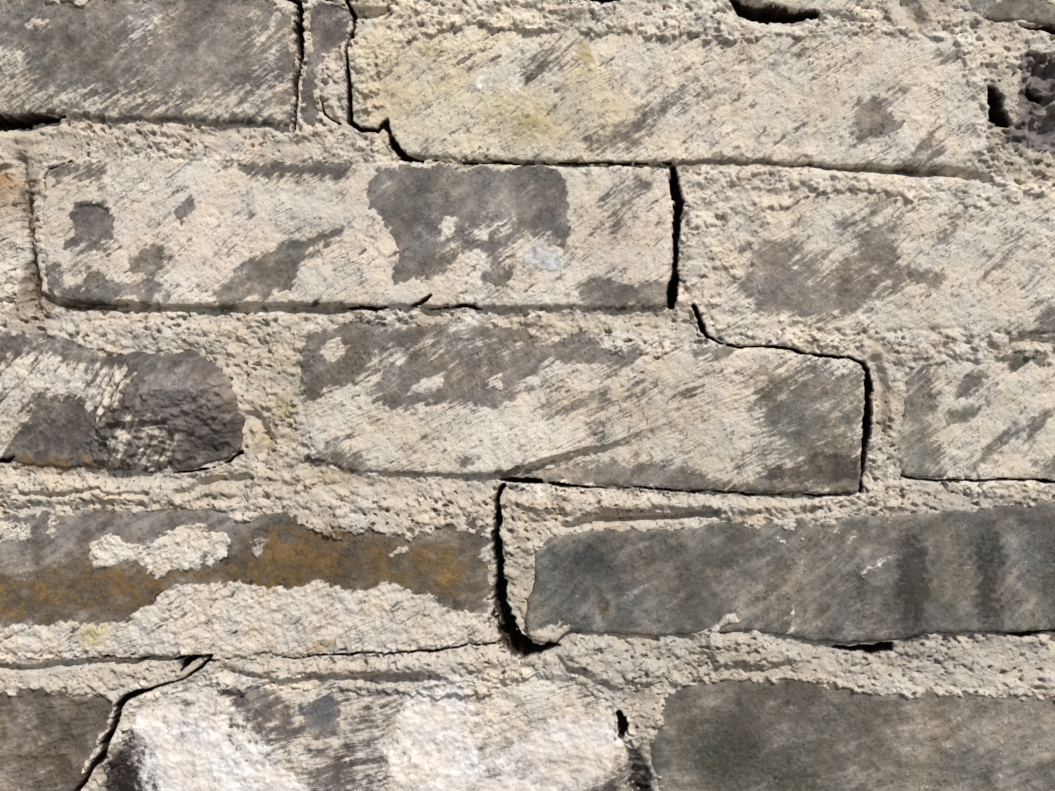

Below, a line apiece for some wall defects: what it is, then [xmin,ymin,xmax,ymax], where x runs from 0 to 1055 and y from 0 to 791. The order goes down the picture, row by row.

crack [570,0,620,8]
crack [729,0,818,25]
crack [1023,25,1055,35]
crack [286,0,518,165]
crack [987,86,1042,128]
crack [0,114,67,132]
crack [272,162,873,660]
crack [176,450,244,473]
crack [76,654,229,791]
crack [616,710,629,739]